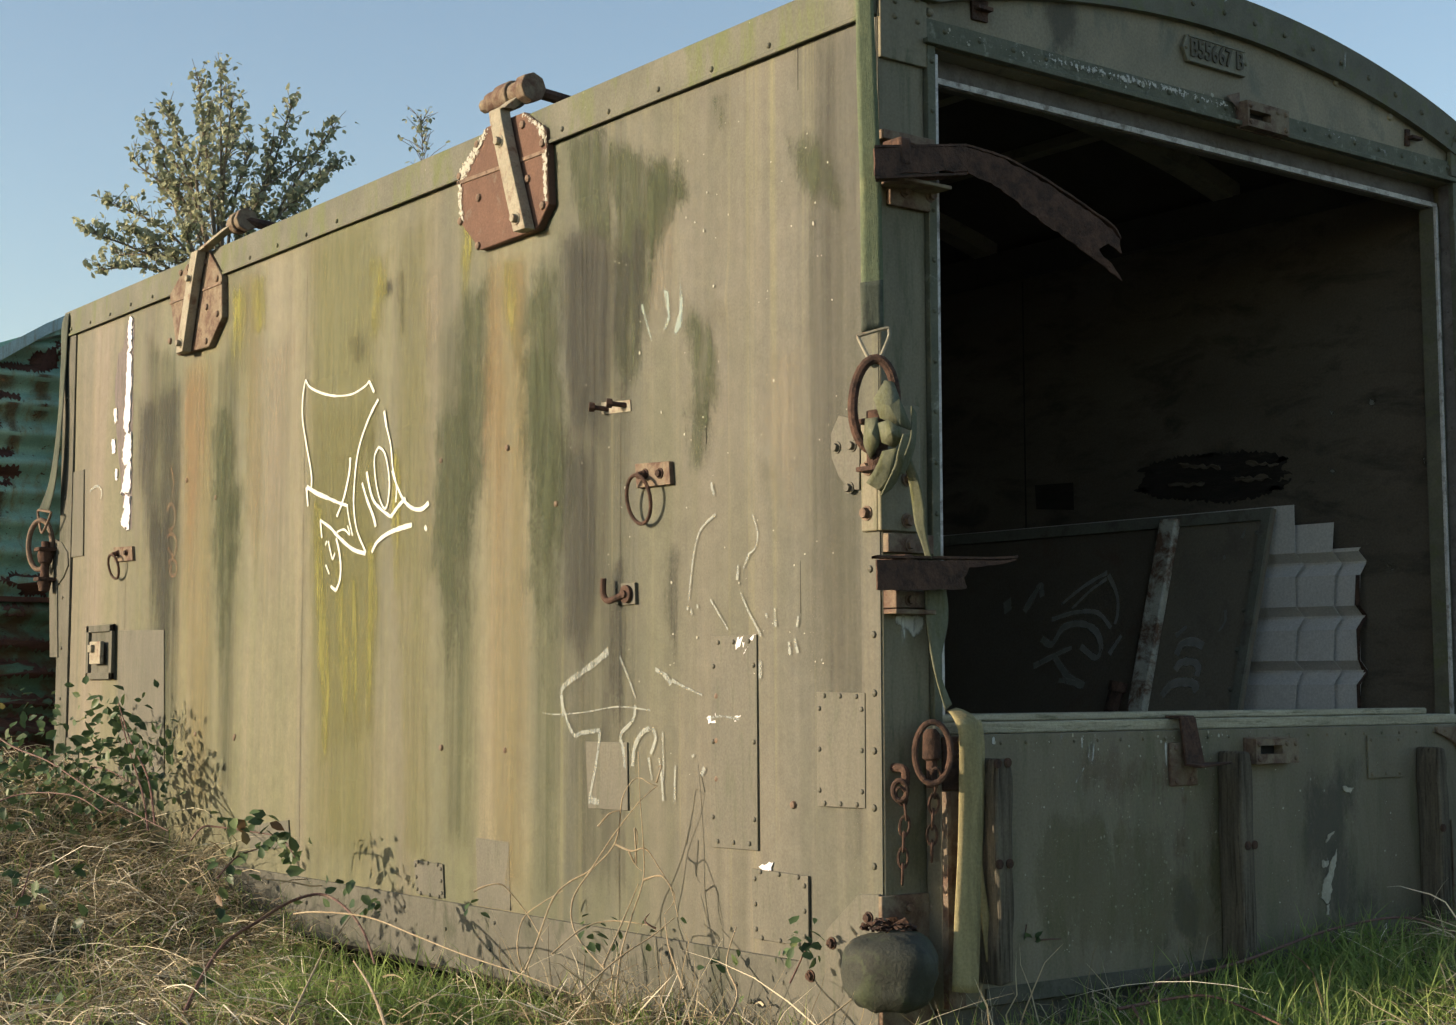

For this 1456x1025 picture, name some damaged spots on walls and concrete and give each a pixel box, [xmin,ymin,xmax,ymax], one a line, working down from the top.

leakage [565,131,682,428]
rust [0,340,61,517]
rust [0,570,48,597]
rust [0,635,55,768]
peeling [1321,831,1337,915]